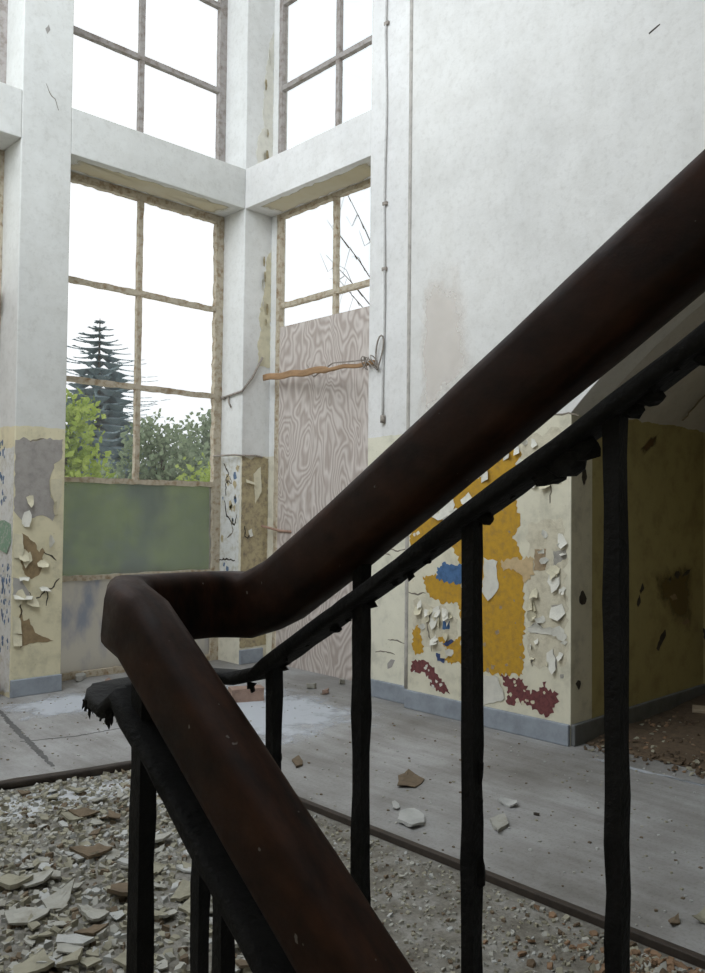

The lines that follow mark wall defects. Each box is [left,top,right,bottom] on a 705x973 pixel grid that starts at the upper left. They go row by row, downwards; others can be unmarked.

peeling [0,437,63,693]
peeling [219,455,268,571]
peeling [239,634,266,648]
peeling [390,540,461,694]
peeling [409,427,561,545]
peeling [482,495,587,718]